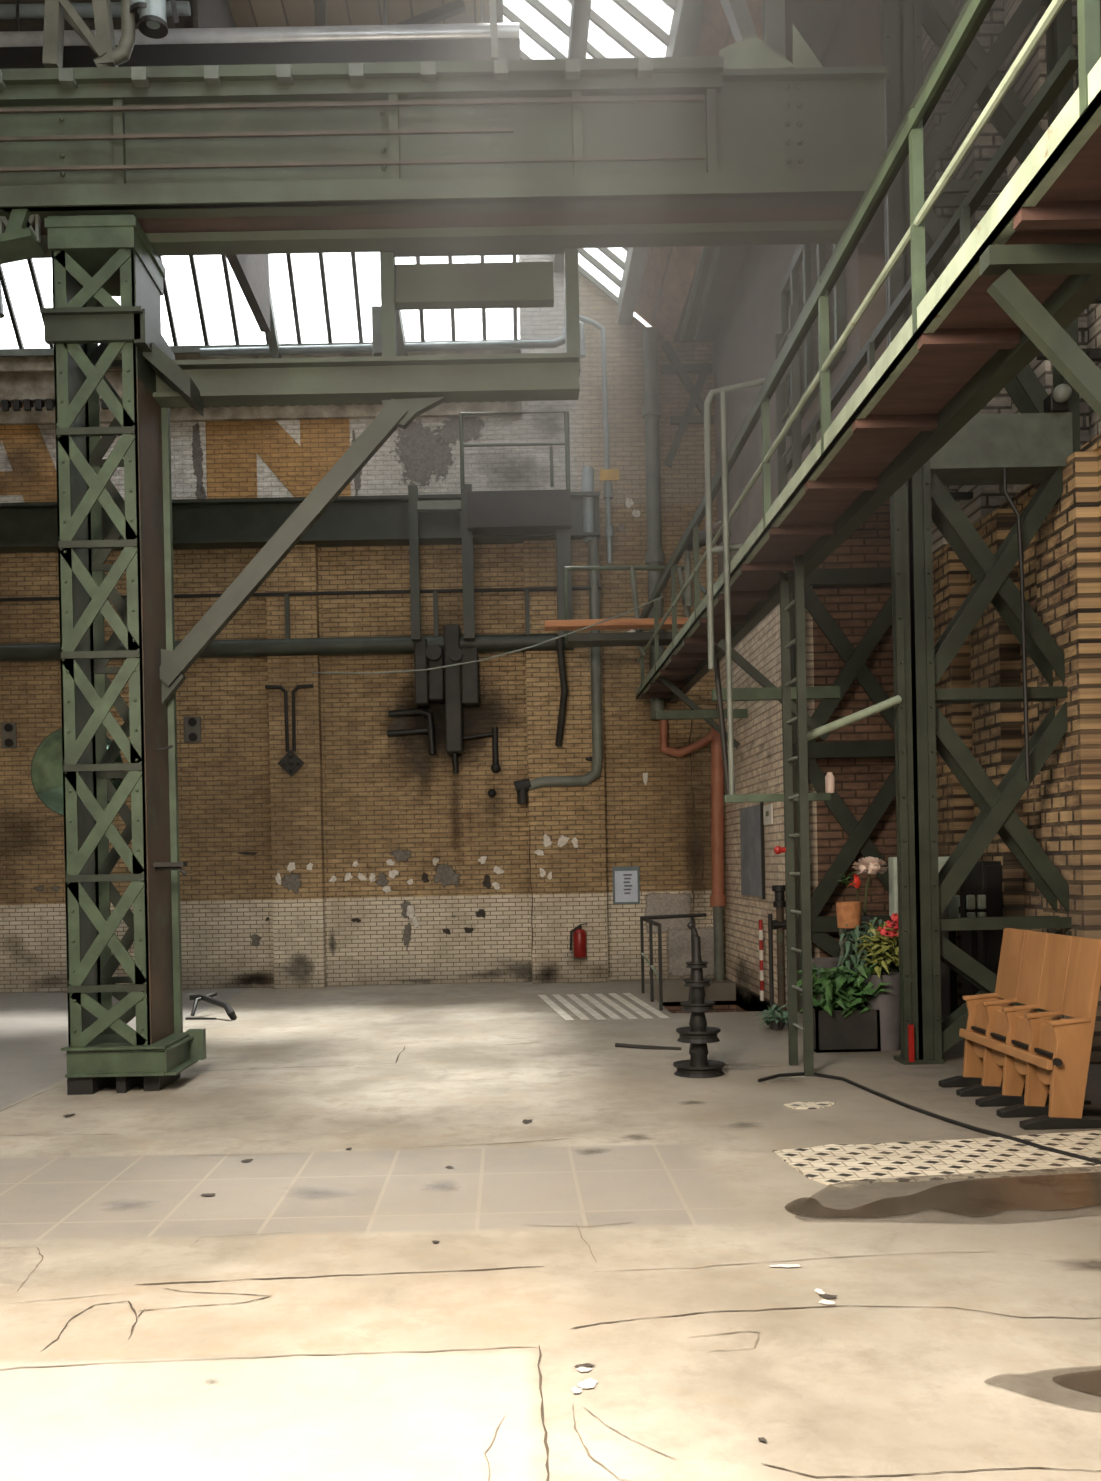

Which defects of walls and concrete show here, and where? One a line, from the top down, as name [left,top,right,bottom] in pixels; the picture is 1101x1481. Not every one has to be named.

spalling [275,862,313,894]
spalling [329,849,461,893]
spalling [478,856,505,890]
spalling [534,834,578,880]
crack [570,1305,914,1351]
crack [953,1307,1088,1319]
crack [0,1232,675,1481]
crack [761,1463,1101,1478]